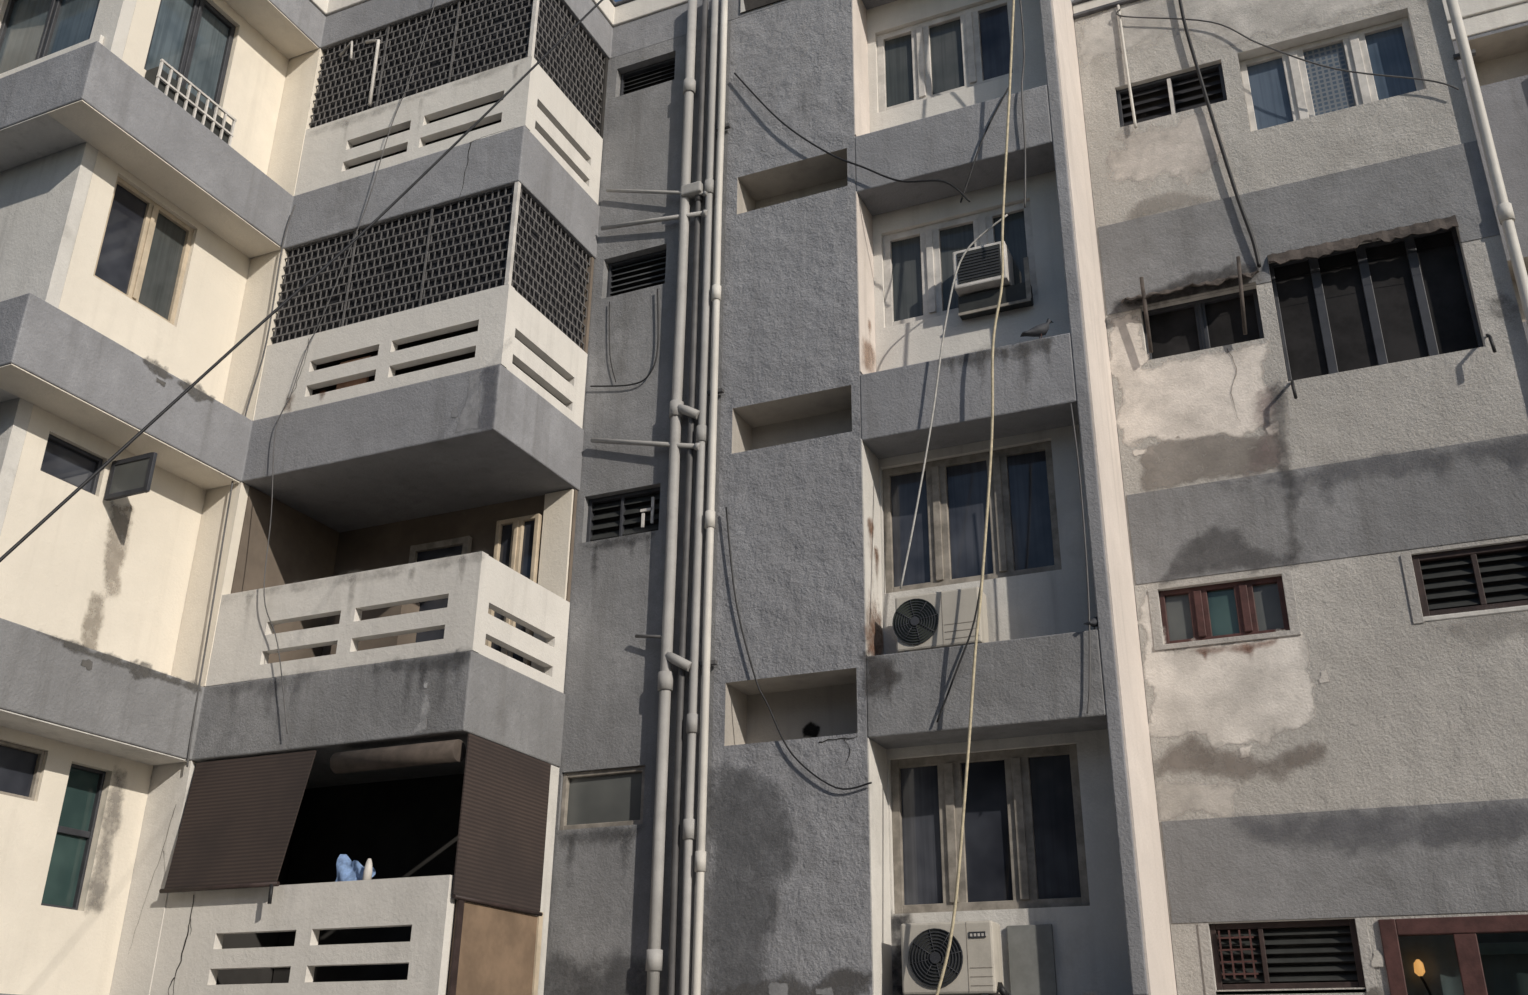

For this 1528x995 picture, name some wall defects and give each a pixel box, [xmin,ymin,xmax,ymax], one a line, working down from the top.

peeling [1110,314,1280,490]
water stain [83,505,132,650]
water stain [1167,528,1297,579]
peeling [1137,594,1330,758]
water stain [1160,738,1324,778]
water stain [88,774,122,908]
crack [128,805,194,995]